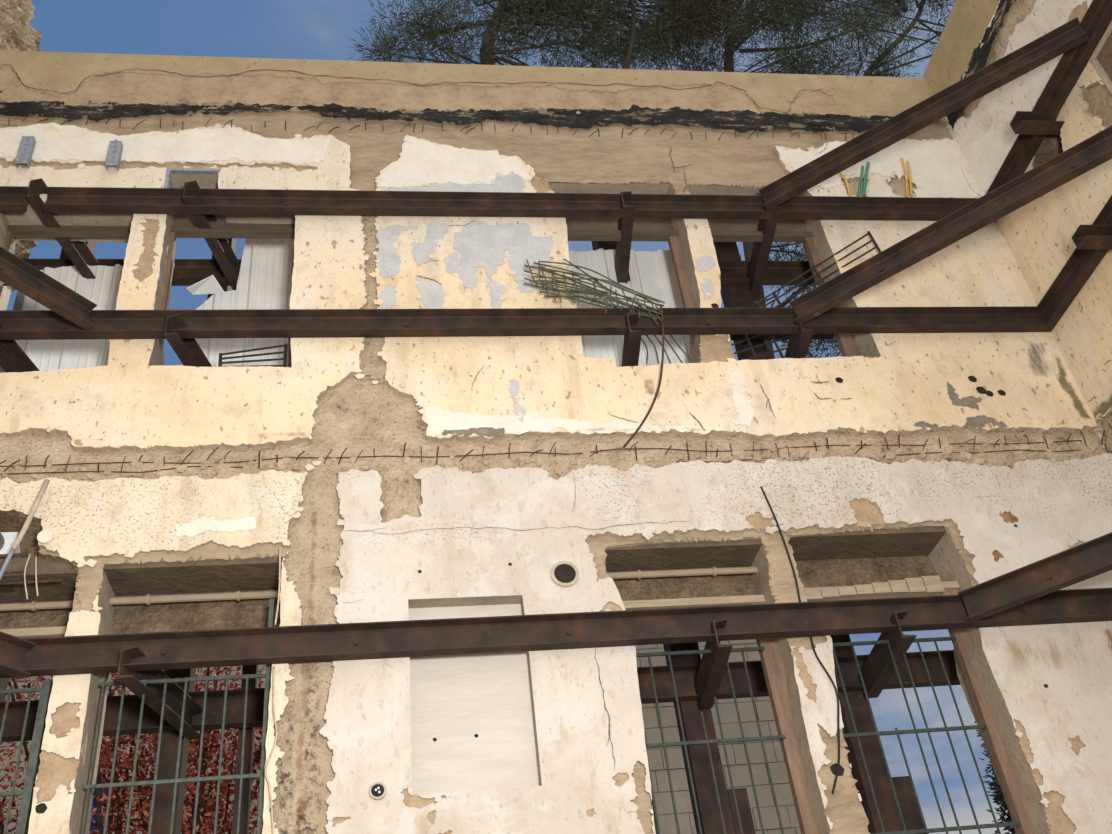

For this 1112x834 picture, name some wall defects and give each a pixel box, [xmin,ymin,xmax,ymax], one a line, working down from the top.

peeling [0,66,761,172]
crack [0,64,834,113]
peeling [375,136,552,193]
spalling [132,216,160,282]
peeling [357,216,554,309]
spalling [354,337,386,385]
peeling [416,379,703,437]
spalling [699,334,755,429]
spalling [946,376,1007,429]
spalling [0,422,1084,625]
spalling [265,661,351,834]
spalling [1014,720,1076,834]